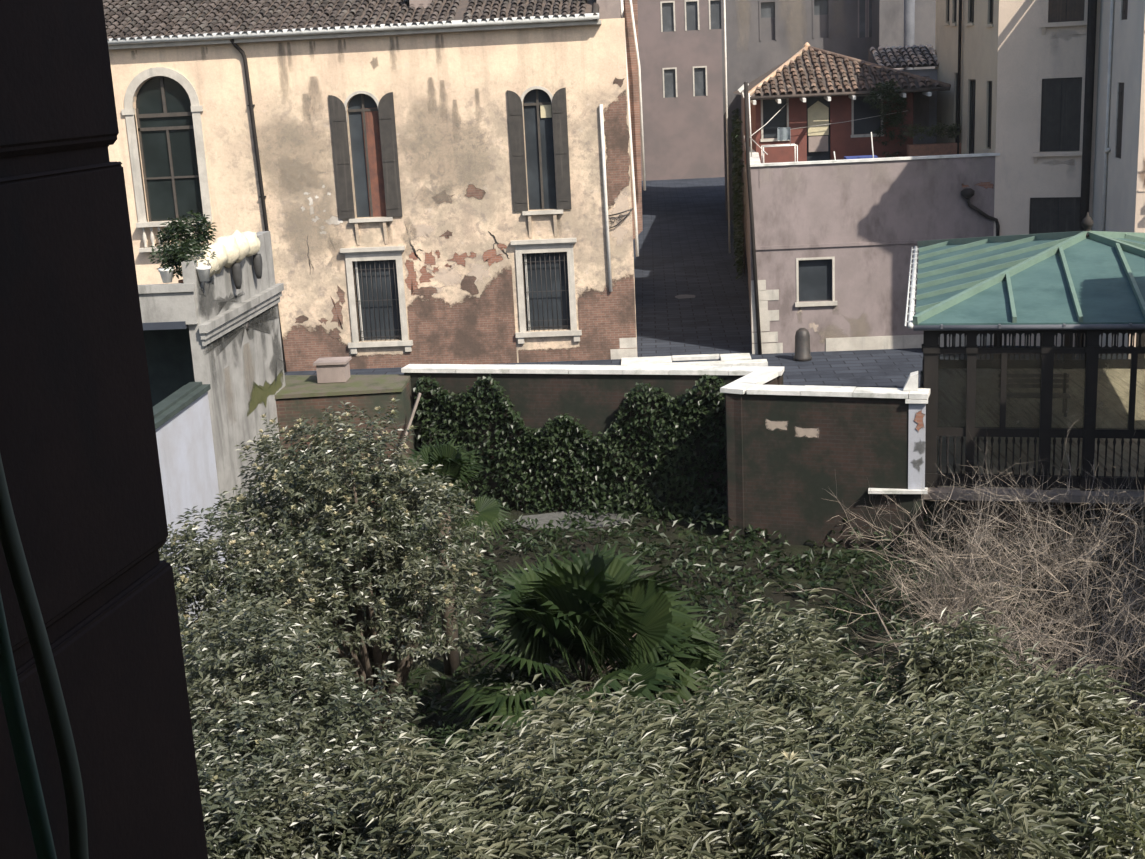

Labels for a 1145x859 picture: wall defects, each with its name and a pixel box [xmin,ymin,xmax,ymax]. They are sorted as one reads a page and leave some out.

flaking render [432,184,485,204]
flaking render [603,77,630,243]
flaking render [283,225,636,372]